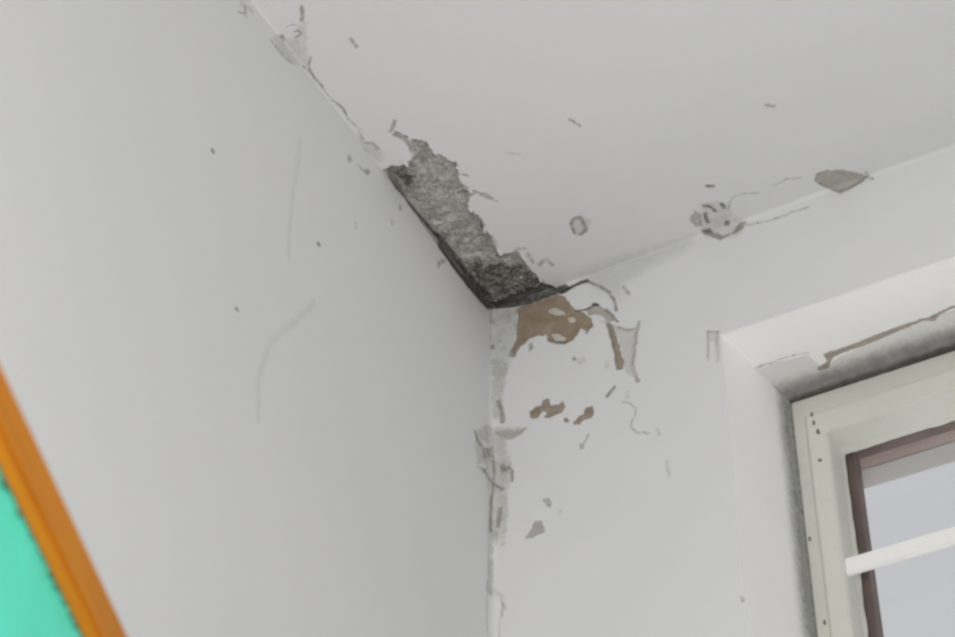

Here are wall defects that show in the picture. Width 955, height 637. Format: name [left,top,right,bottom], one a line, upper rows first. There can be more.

peeling [815,170,874,192]
peeling [691,203,746,239]
flaking render [383,122,640,382]
peeling [818,306,955,370]
water stain [786,335,955,403]
peeling [530,399,594,425]
peeling [526,521,544,538]